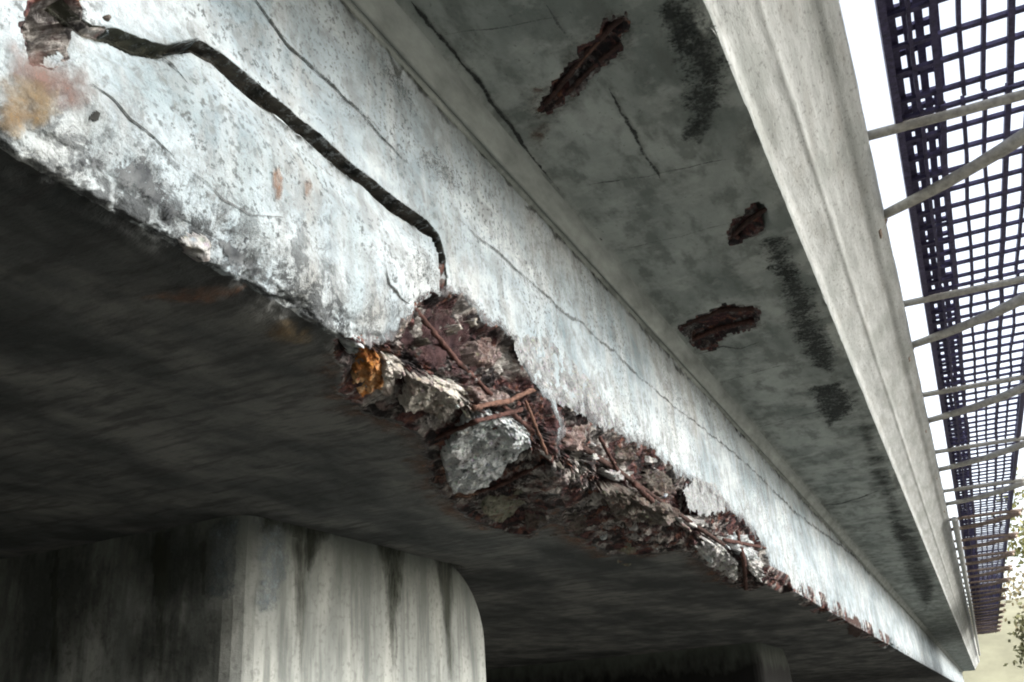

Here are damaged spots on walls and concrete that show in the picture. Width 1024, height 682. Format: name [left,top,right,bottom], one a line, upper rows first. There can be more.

spalling [18,0,111,70]
spalling [537,11,631,115]
leakage [659,0,729,144]
peeling [66,139,186,240]
crack [44,0,447,292]
spalling [726,203,767,246]
crack [386,269,410,304]
leakage [761,237,837,371]
spalling [208,228,890,647]
leakage [809,381,857,426]
leakage [378,545,404,632]
leakage [437,560,462,670]